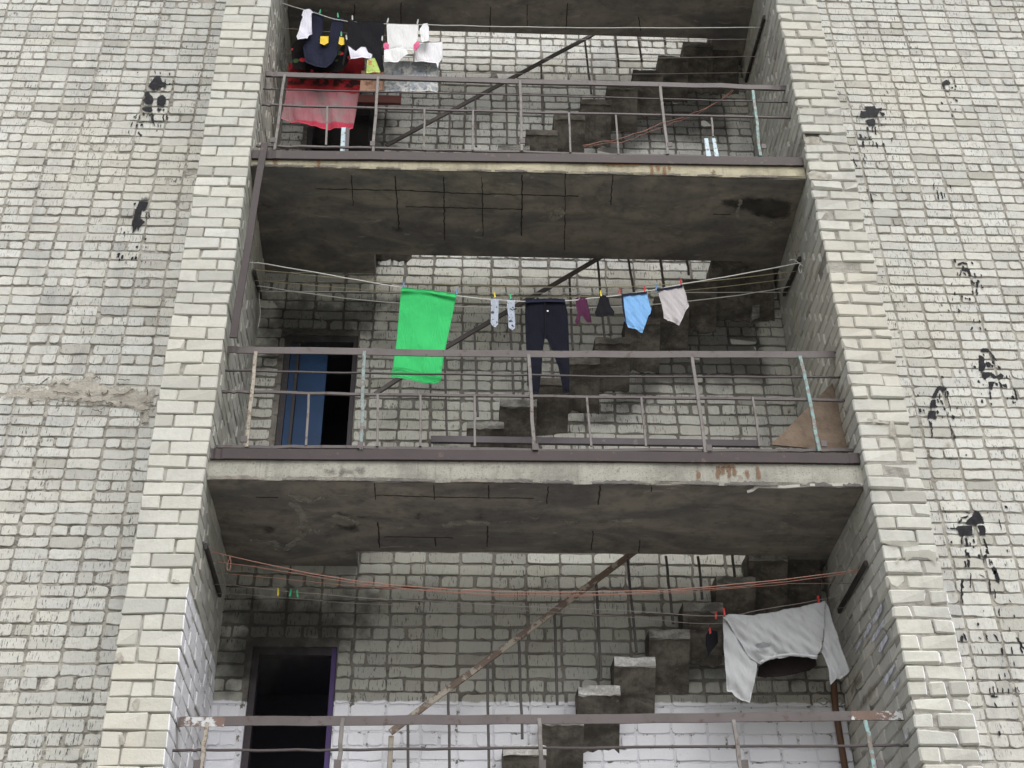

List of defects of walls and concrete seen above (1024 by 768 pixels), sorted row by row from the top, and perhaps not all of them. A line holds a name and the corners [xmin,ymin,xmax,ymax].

leakage [725,199,790,218]
spalling [4,373,155,425]
corrosion [716,465,761,479]